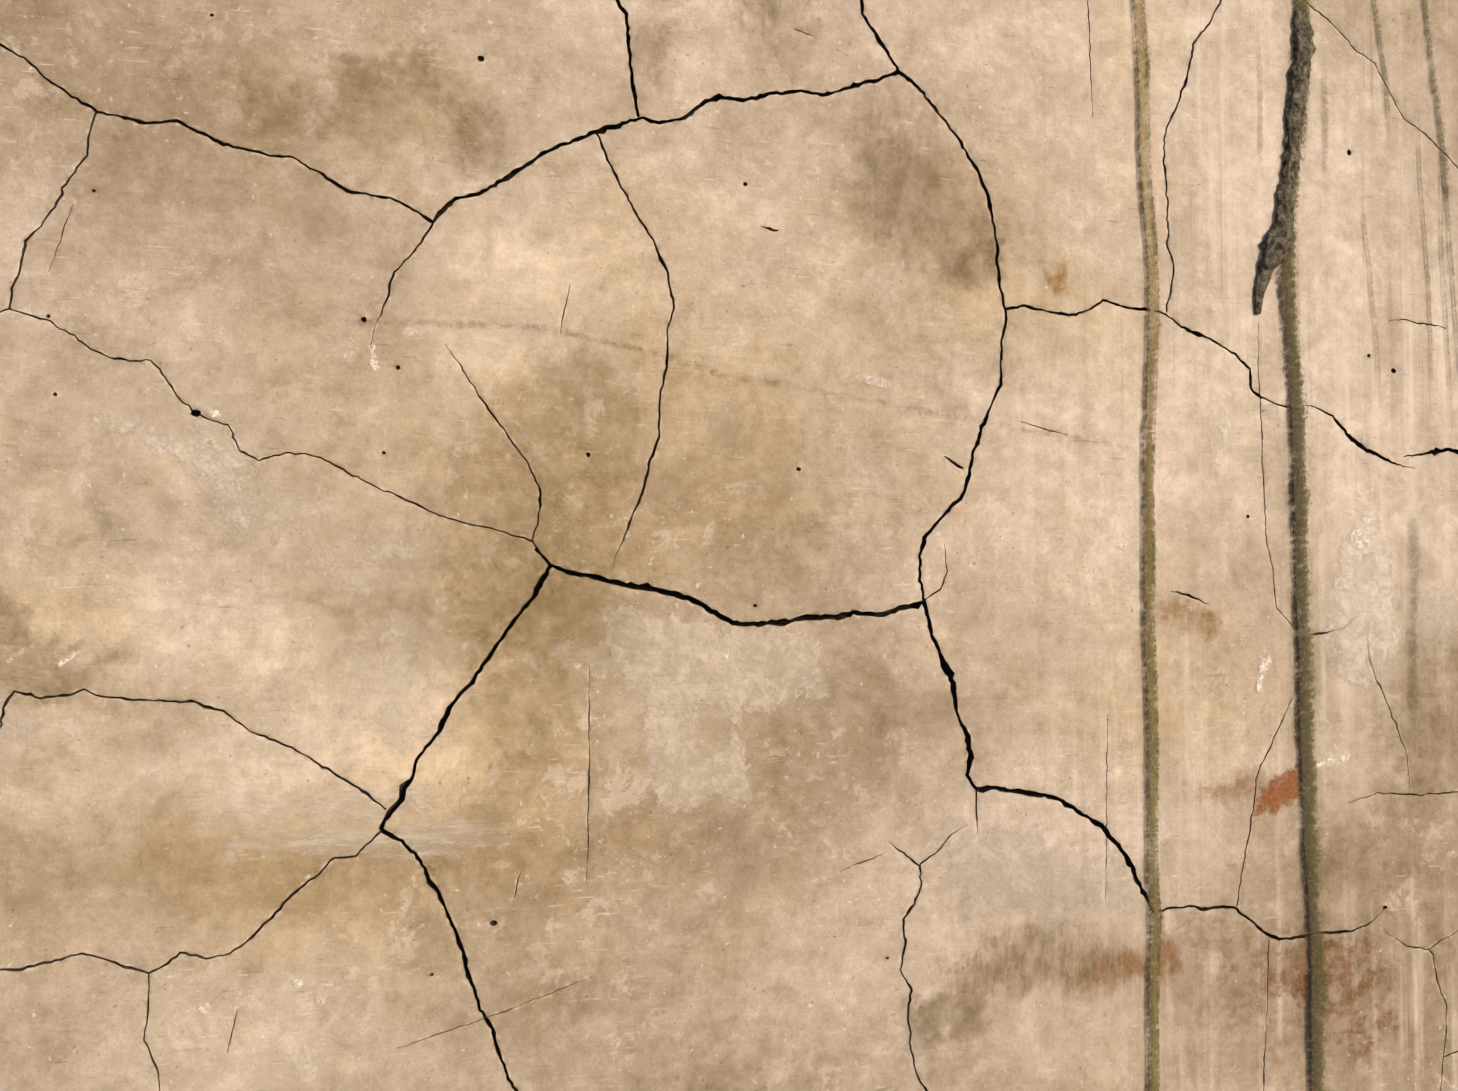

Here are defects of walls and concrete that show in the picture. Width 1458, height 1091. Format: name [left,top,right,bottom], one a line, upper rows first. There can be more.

crack [1304,0,1458,169]
crack [0,0,1292,626]
crack [1304,405,1458,468]
crack [0,344,1311,1091]
corrosion [1256,770,1301,815]
crack [1349,678,1458,803]
crack [1316,907,1385,934]
crack [1385,930,1458,1091]